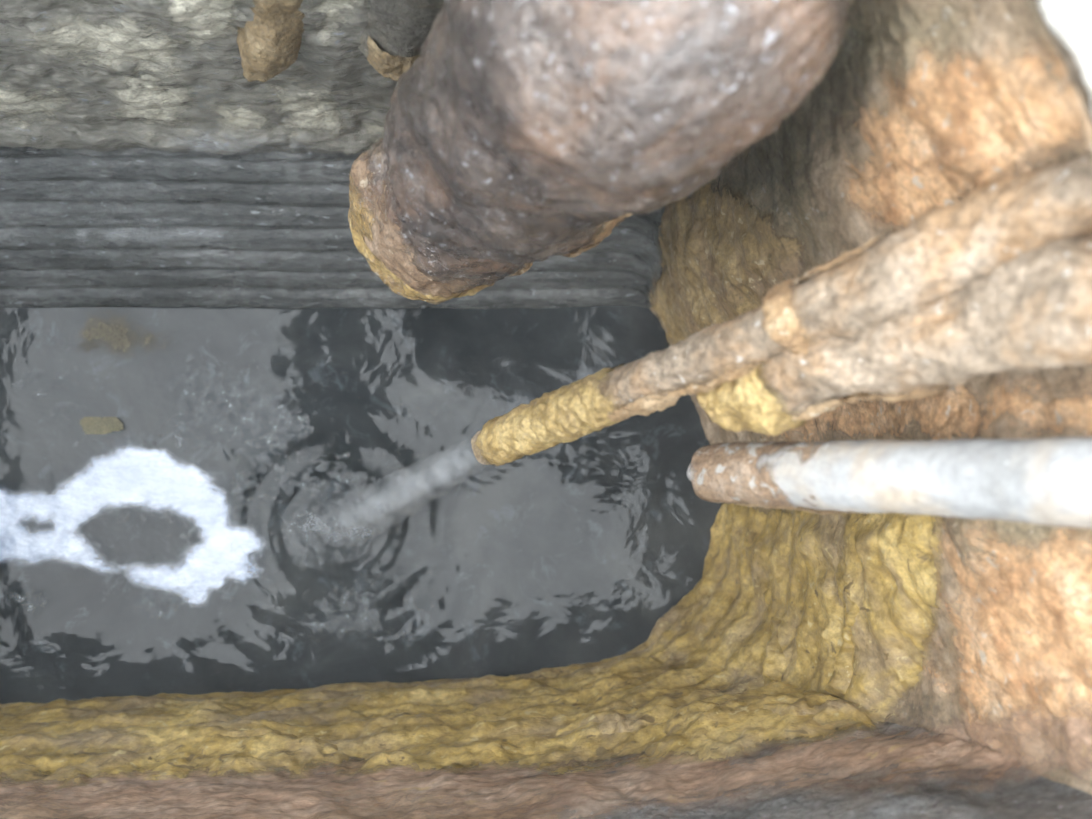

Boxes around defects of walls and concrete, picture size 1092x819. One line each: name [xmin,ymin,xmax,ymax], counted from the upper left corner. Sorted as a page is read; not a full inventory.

damp [0,503,940,786]